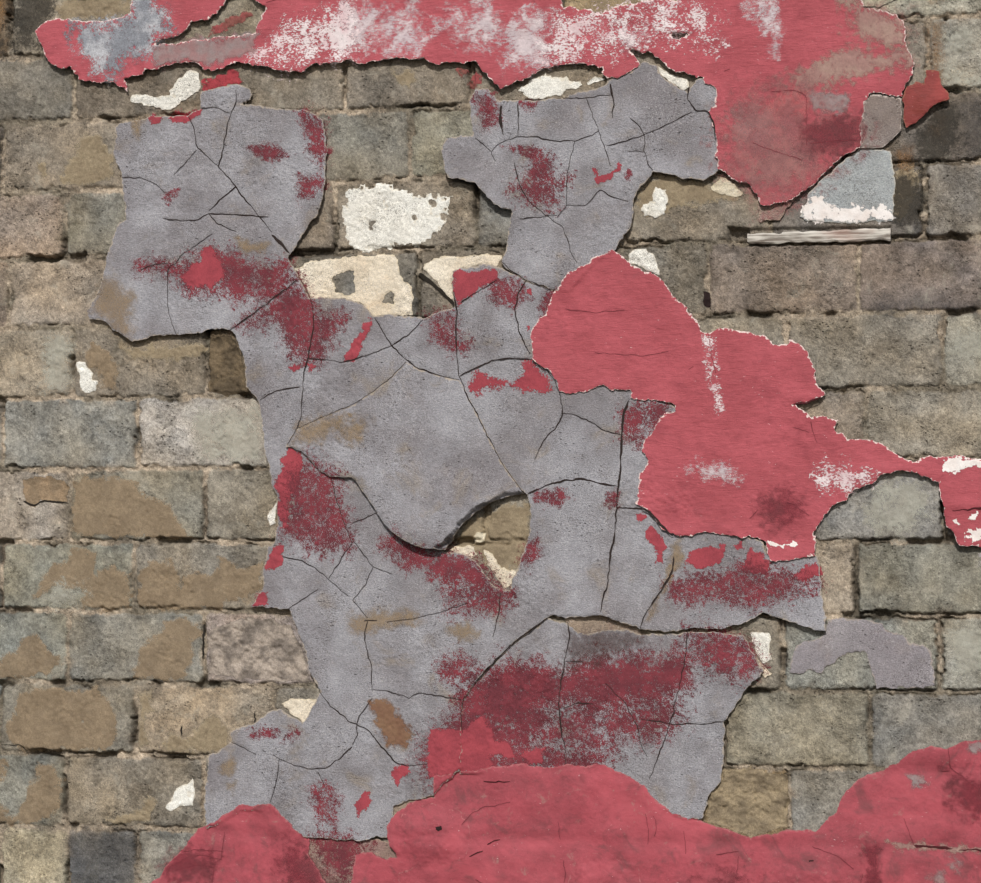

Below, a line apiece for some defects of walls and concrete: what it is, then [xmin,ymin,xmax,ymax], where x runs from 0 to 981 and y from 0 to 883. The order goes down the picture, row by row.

peeling [208,11,253,37]
crack [477,84,716,262]
crack [141,94,289,335]
spalling [703,291,711,308]
crack [230,261,674,629]
peeling [809,465,870,495]
crack [199,624,207,659]
crack [232,478,591,802]
crack [605,631,724,779]
peeling [907,774,926,788]
peeling [893,841,926,850]
peeling [283,850,319,883]